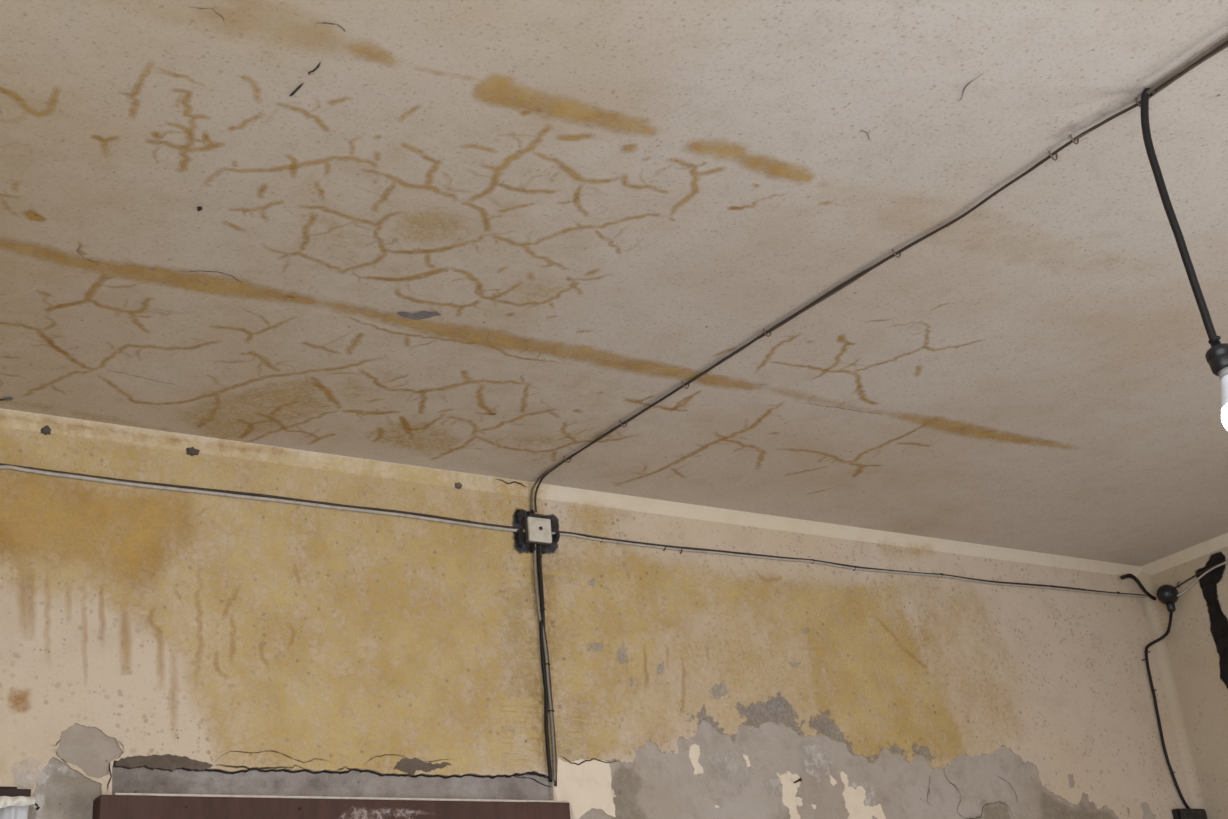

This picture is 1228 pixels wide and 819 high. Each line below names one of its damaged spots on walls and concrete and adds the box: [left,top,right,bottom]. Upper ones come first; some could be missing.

crack [289,63,342,129]
leakage [691,144,812,180]
crack [232,112,643,315]
leakage [0,241,312,303]
crack [1,251,619,459]
leakage [337,306,751,388]
crack [760,330,939,414]
crack [627,409,928,482]
leakage [907,416,1066,447]
leakage [0,421,959,775]
peeling [15,723,213,819]
peeling [580,683,1155,819]